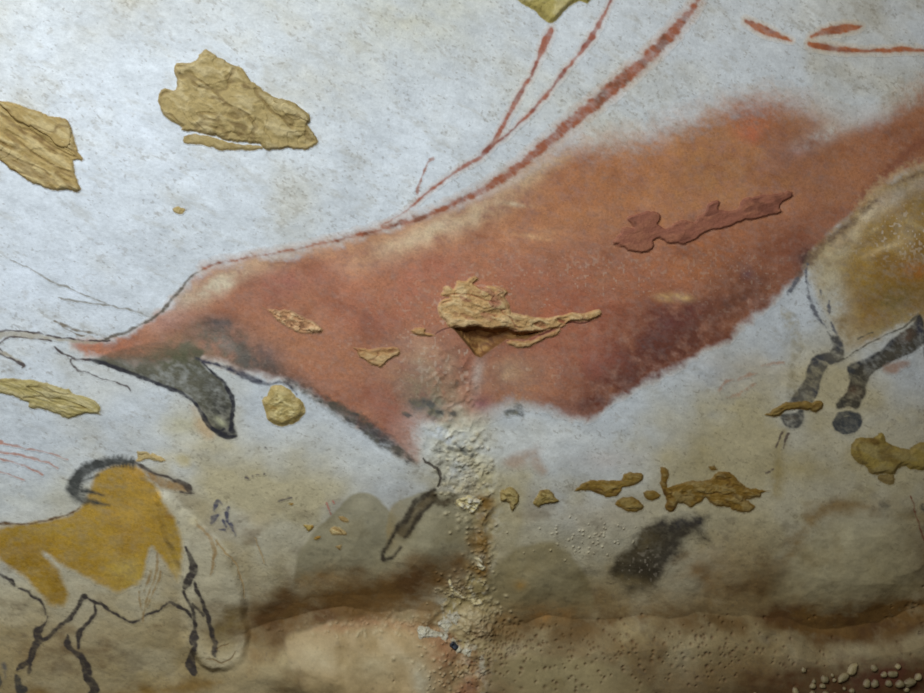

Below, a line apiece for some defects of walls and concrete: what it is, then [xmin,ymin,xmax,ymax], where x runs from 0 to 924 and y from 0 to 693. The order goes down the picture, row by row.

peeling [517,0,591,24]
peeling [158,48,319,152]
peeling [0,100,84,193]
spalling [437,275,602,358]
peeling [0,377,101,419]
peeling [261,384,306,427]
peeling [850,432,924,486]
damp [454,495,483,515]
peeling [574,465,771,513]
damp [474,557,487,571]
damp [448,579,483,606]
damp [417,609,472,658]